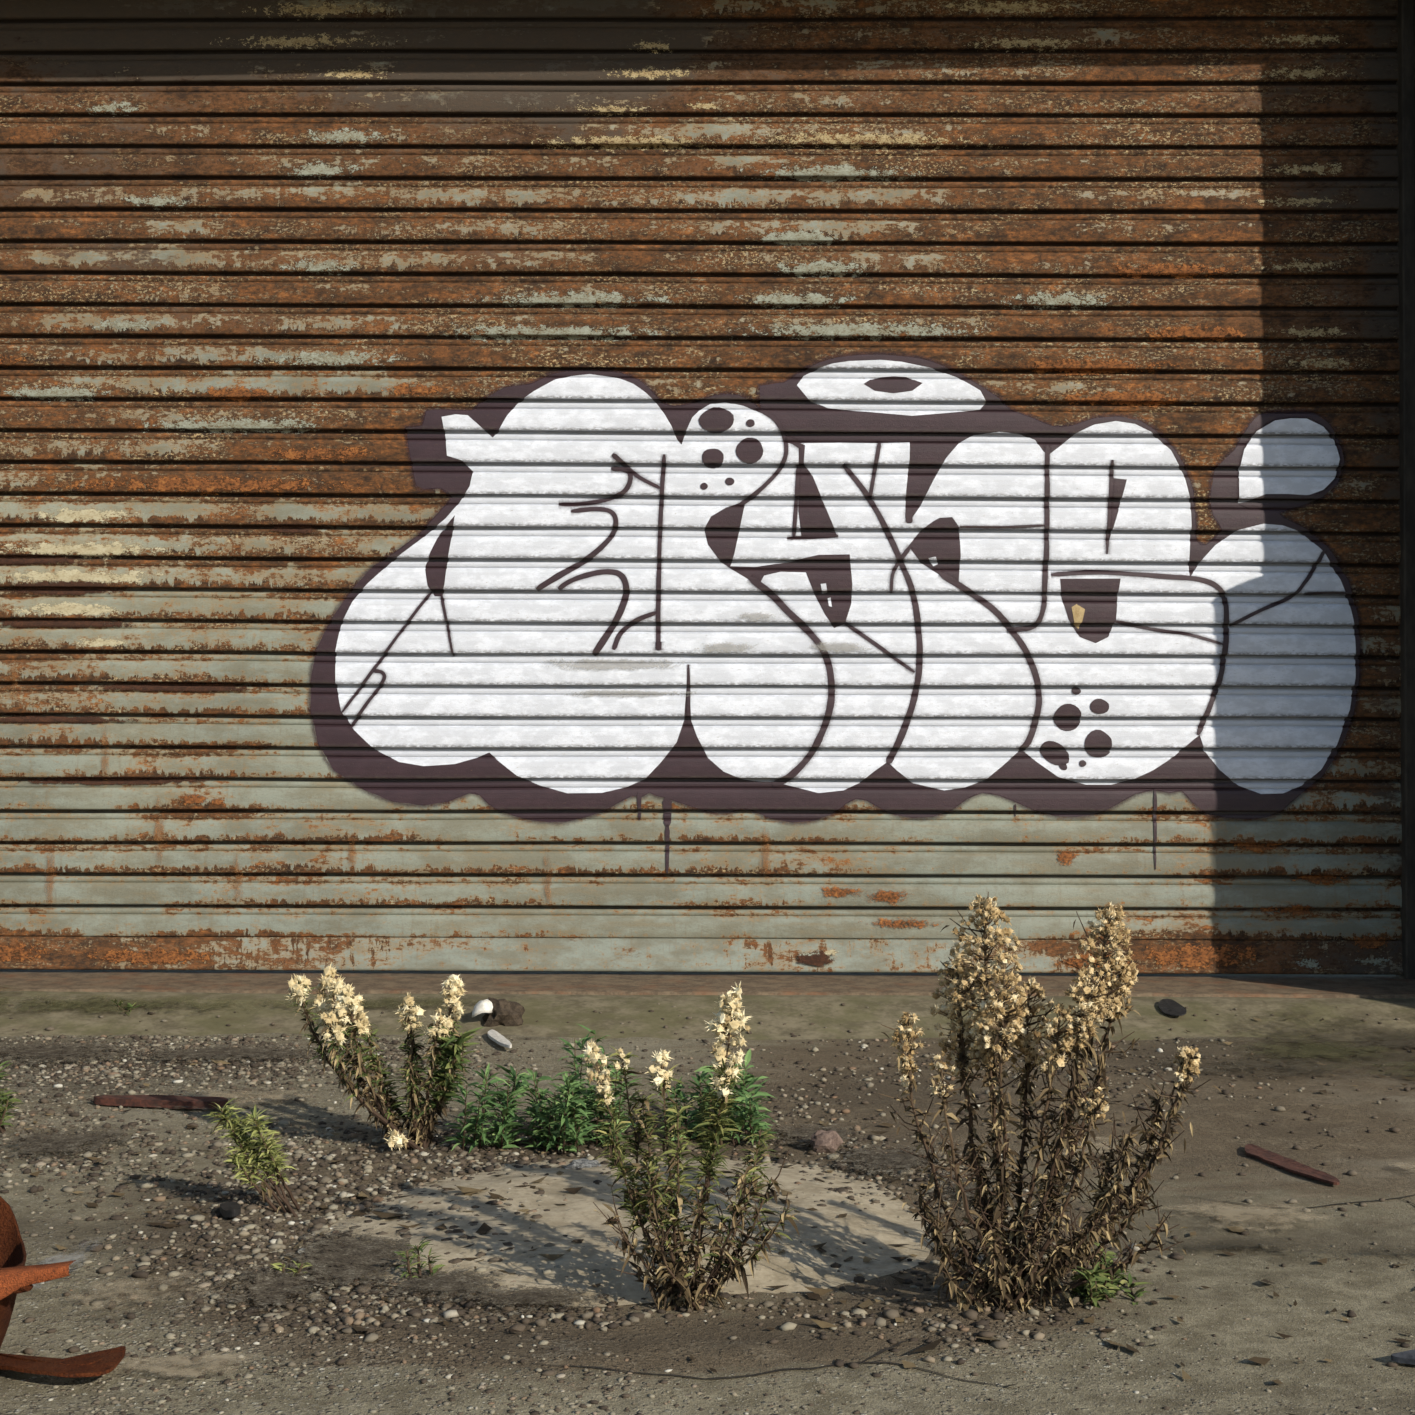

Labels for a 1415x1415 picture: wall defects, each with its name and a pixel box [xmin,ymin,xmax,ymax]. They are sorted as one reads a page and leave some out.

peeling [287,128,387,180]
peeling [531,103,1016,182]
peeling [728,229,991,341]
rust [1097,262,1252,279]
peeling [427,289,671,343]
rust [1131,325,1257,342]
rust [993,357,1201,408]
peeling [18,508,143,524]
peeling [0,541,179,584]
rust [1055,850,1080,865]
rust [822,886,938,929]
rust [1144,941,1261,969]